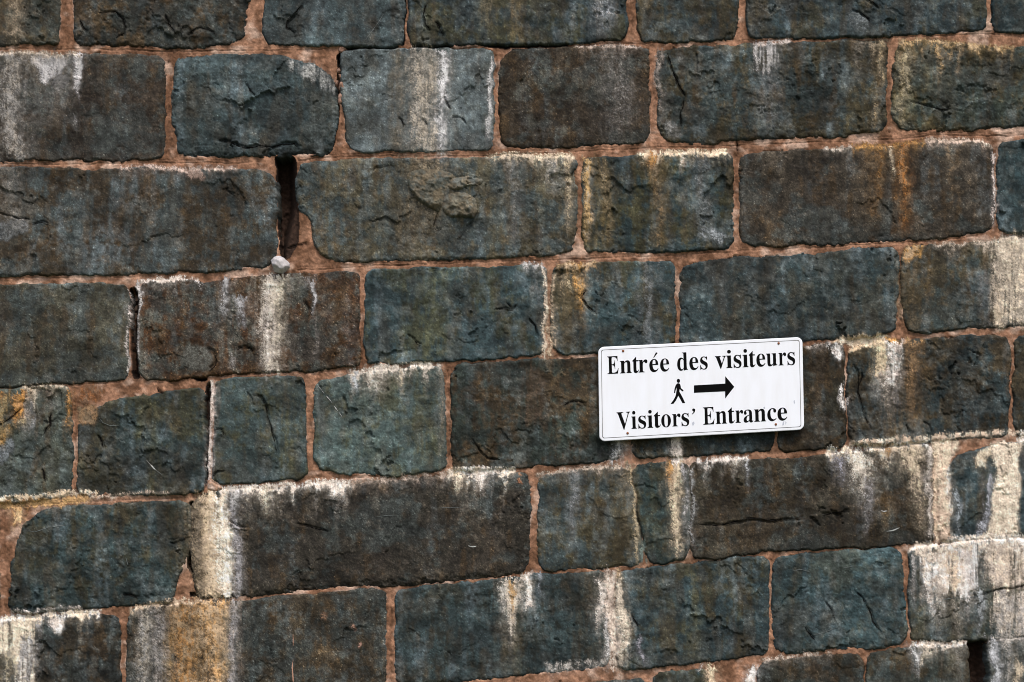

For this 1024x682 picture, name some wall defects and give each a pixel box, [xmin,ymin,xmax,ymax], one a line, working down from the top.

water stain [0,0,83,161]
water stain [409,44,449,171]
water stain [219,276,245,325]
water stain [257,273,284,375]
water stain [349,361,441,387]
water stain [831,332,902,394]
water stain [935,231,1024,329]
water stain [130,380,516,682]
water stain [497,571,541,636]
water stain [549,564,644,672]
water stain [825,428,1024,682]